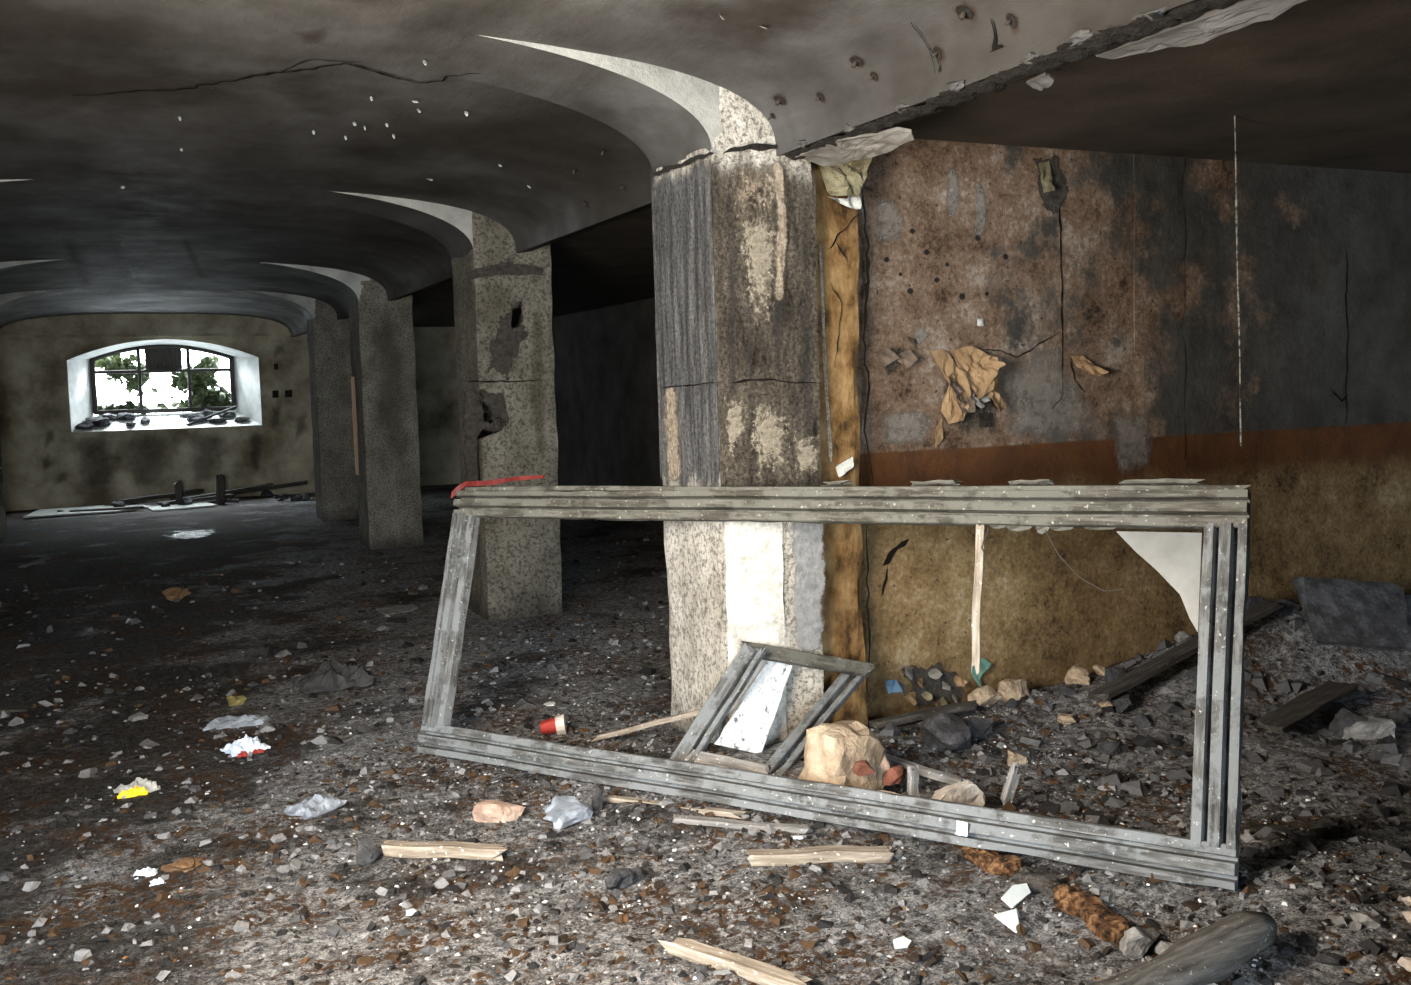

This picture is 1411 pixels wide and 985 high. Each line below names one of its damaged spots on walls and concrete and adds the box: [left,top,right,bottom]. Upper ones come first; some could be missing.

spalling [651,0,1243,325]
flaking render [463,301,529,481]
crack [663,189,873,486]
flaking render [724,243,854,478]
crack [866,526,909,699]